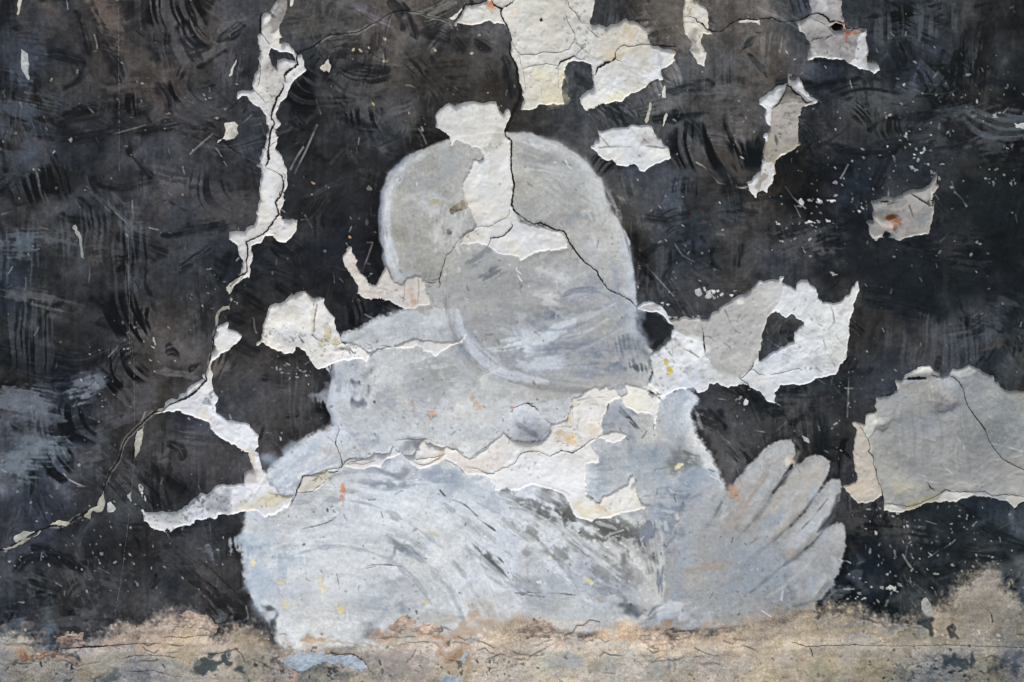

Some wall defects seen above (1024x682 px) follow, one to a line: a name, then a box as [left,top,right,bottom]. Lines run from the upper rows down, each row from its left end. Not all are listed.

peeling [795,0,880,74]
peeling [866,170,939,241]
crack [0,0,676,551]
peeling [127,0,859,532]
peeling [843,365,1024,513]
crack [885,374,1024,470]
damp [88,671,151,682]
flaking render [173,611,219,634]
damp [189,648,247,677]
flaking render [390,614,443,635]
flaking render [518,617,558,639]
damp [881,648,1024,682]